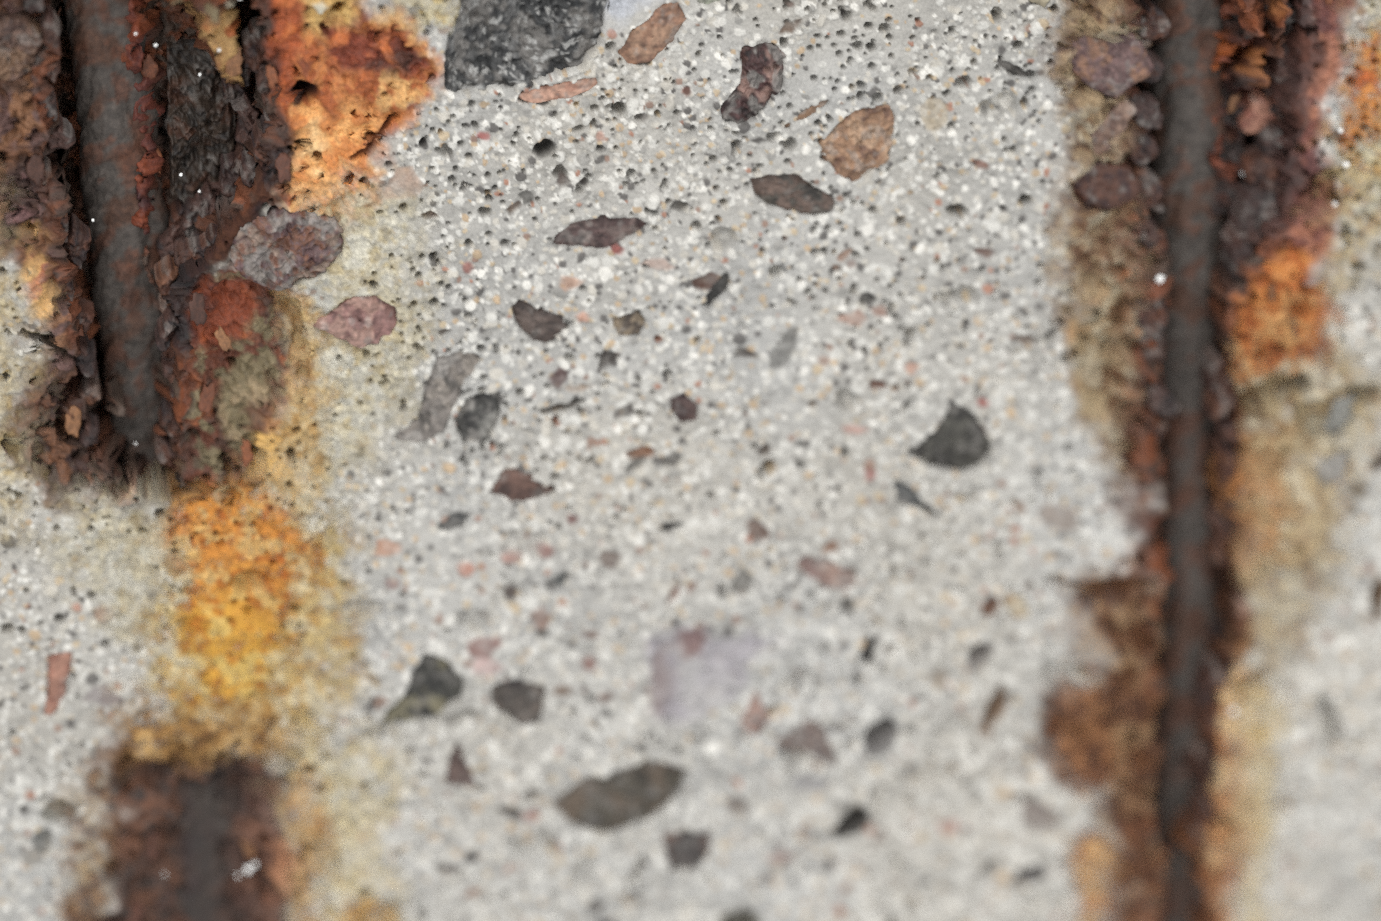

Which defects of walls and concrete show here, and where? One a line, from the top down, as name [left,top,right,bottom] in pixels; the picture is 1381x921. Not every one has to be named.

spalling [0,0,444,514]
rust [1324,20,1381,256]
rust [54,192,427,764]
spalling [1032,0,1376,921]
rust [61,810,109,921]
spalling [58,727,326,921]
rust [1042,678,1126,792]
rust [1206,667,1281,921]